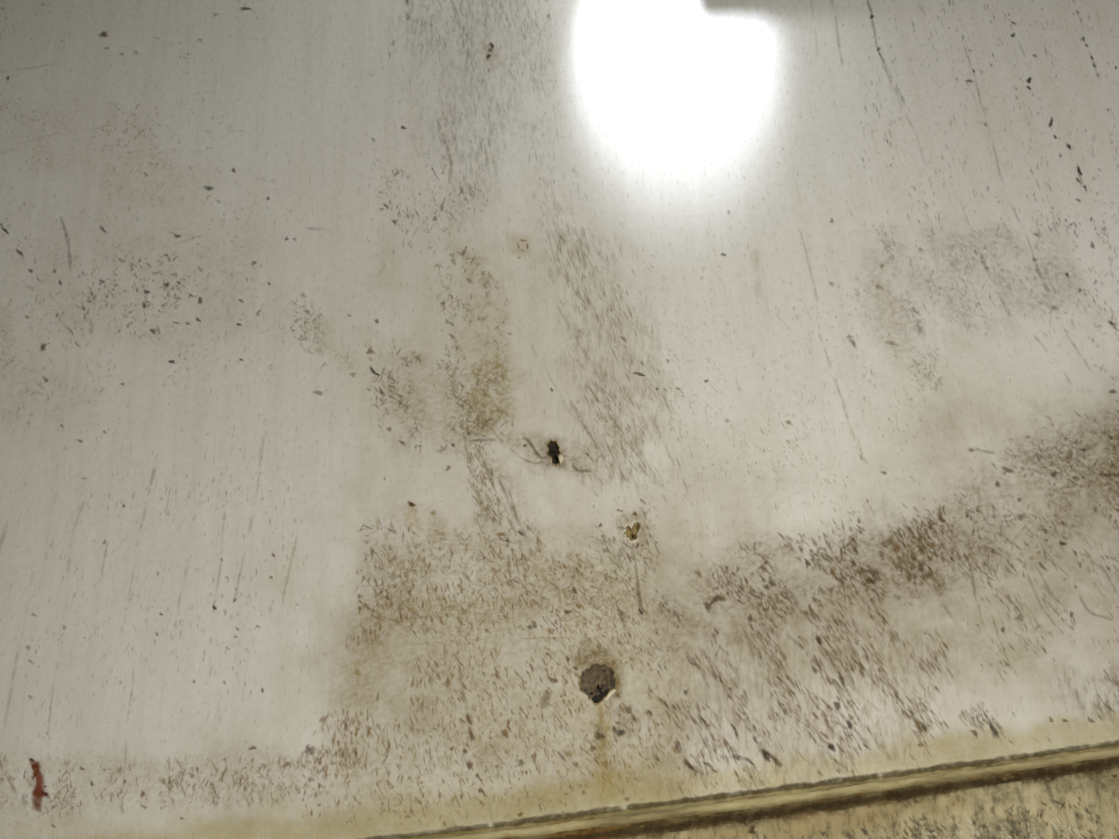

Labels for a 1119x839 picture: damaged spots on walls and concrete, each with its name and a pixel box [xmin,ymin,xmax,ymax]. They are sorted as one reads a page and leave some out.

spalling [579,663,616,704]
leakage [442,740,1119,833]